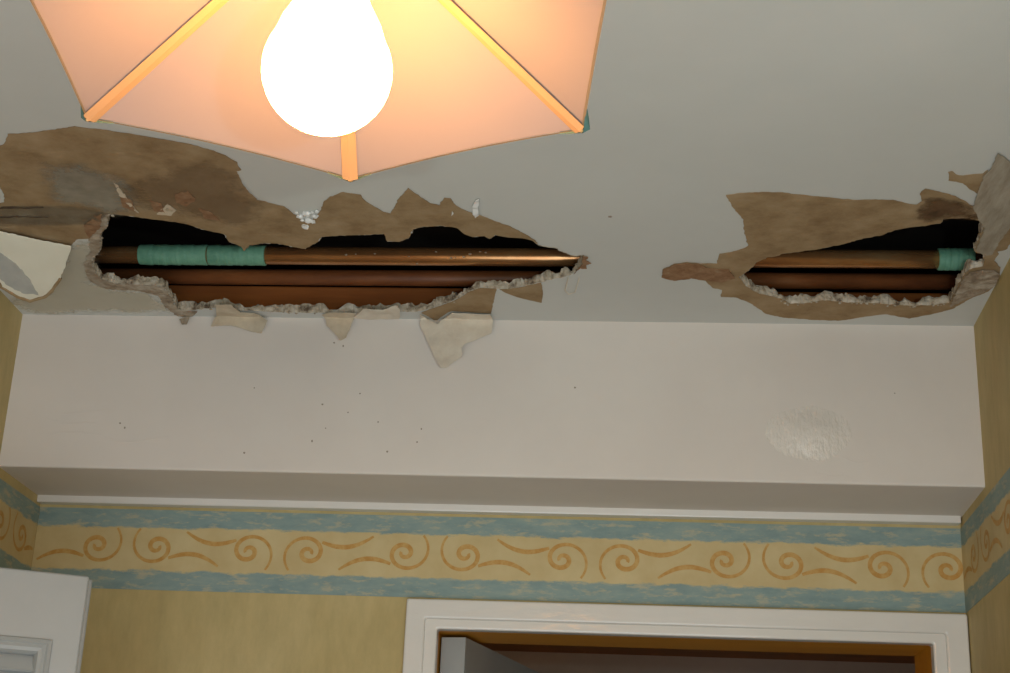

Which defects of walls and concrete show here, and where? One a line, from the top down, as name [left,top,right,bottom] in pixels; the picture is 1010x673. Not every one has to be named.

peeling [294,210,319,230]
peeling [0,231,71,303]
spalling [83,214,583,368]
spalling [740,222,999,307]